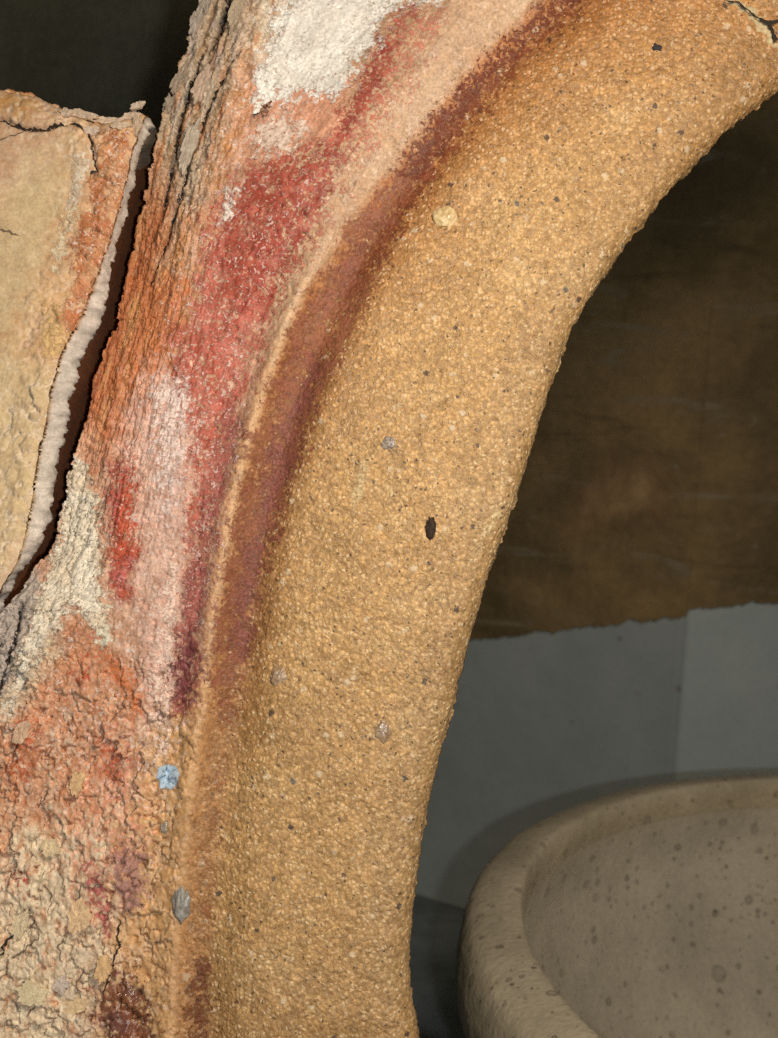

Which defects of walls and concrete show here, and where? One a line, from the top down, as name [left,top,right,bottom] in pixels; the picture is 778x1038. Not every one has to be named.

peeling [189,0,212,40]
peeling [227,0,246,35]
crack [725,0,778,56]
peeling [162,58,213,114]
crack [0,120,99,179]
peeling [178,118,201,175]
peeling [216,186,245,226]
water stain [81,0,591,1038]
crack [0,606,23,689]
crack [9,818,17,852]
crack [0,886,121,1016]